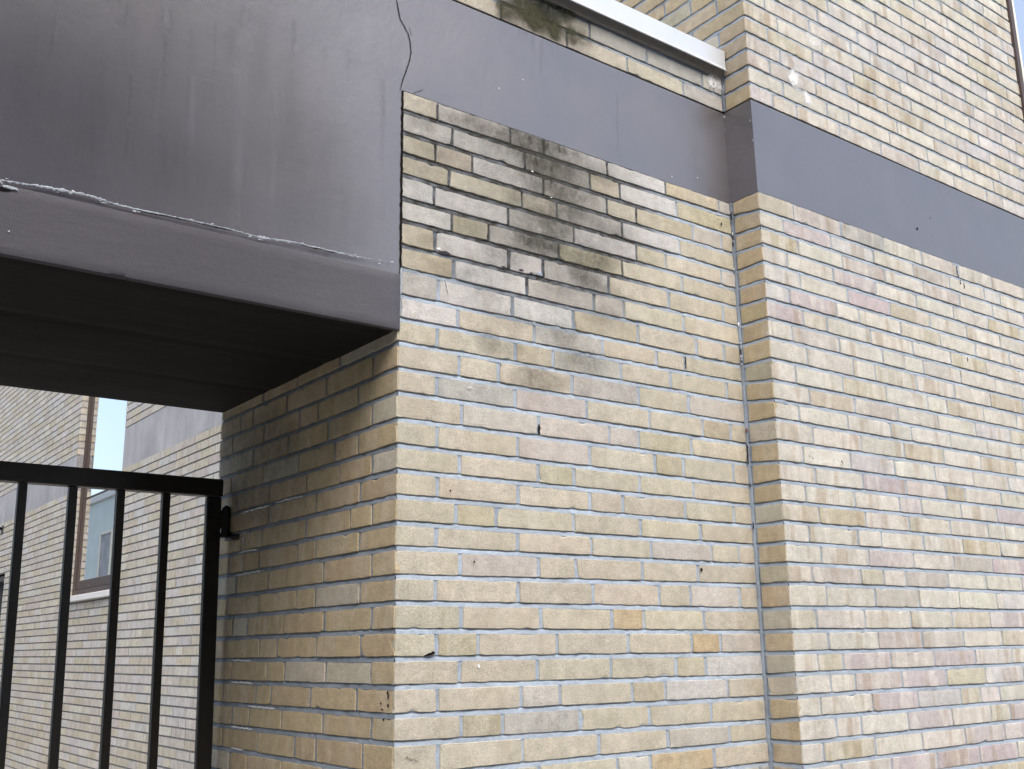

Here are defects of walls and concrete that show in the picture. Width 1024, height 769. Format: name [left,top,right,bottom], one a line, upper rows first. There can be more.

damp [497,0,581,43]
crack [396,0,423,269]
damp [494,128,581,214]